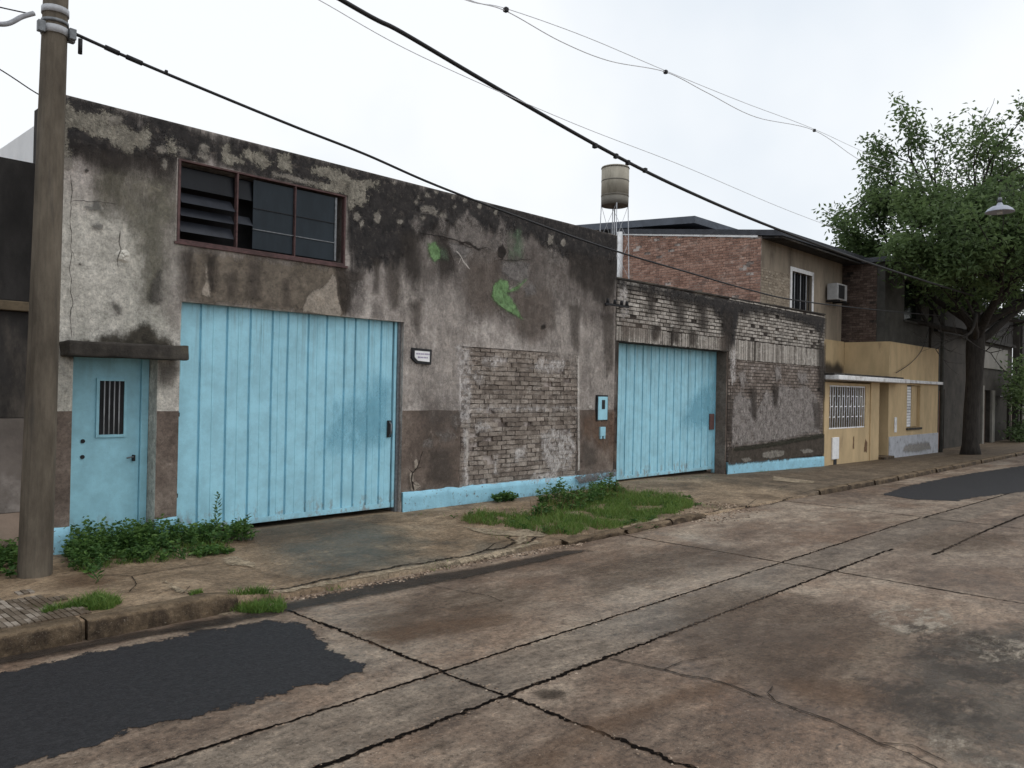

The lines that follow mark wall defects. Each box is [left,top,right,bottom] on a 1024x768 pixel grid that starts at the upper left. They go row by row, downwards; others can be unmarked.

crack [418,231,530,272]
water stain [66,95,843,483]
crack [409,452,423,490]